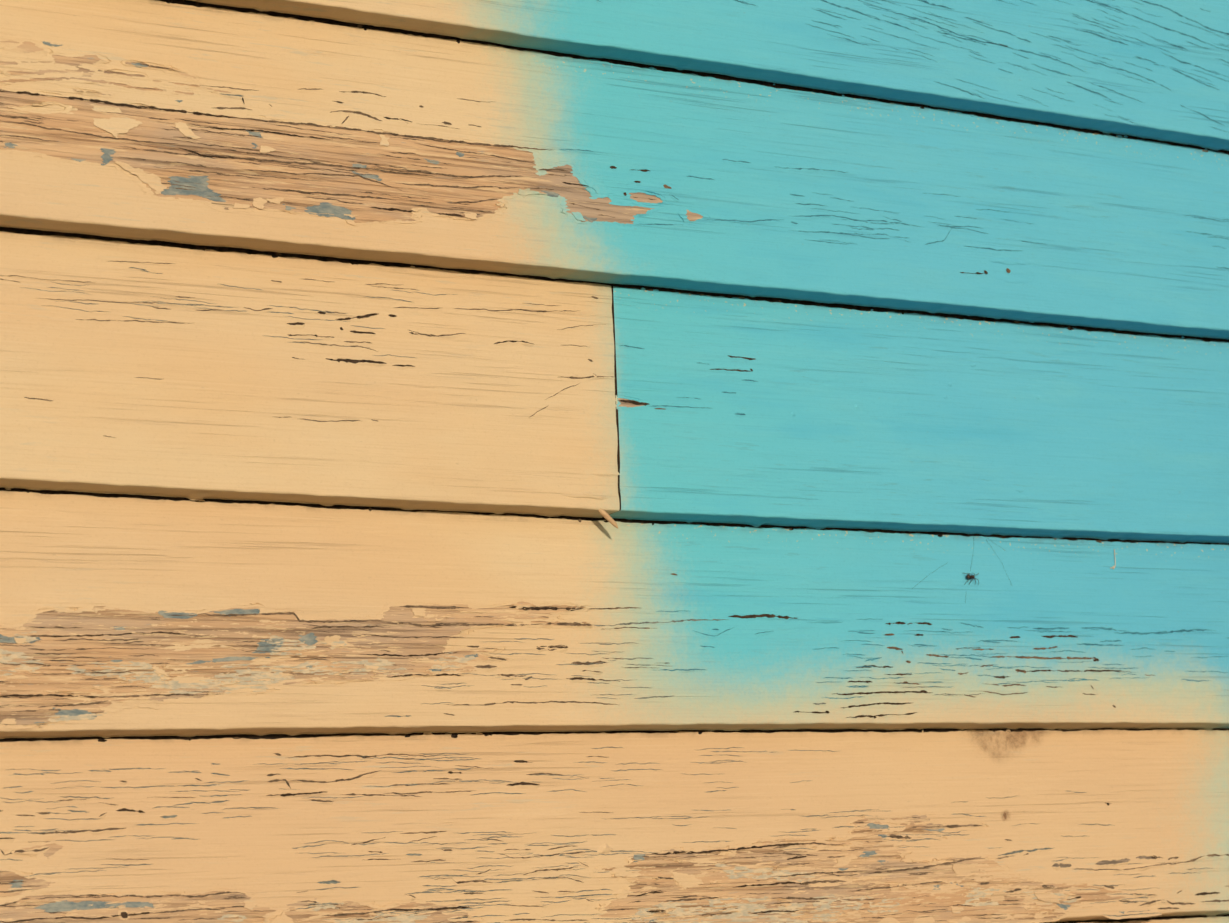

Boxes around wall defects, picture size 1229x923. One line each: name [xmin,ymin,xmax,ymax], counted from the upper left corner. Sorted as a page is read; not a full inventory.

peeling [0,38,710,227]
peeling [0,598,601,729]
peeling [0,811,1229,923]